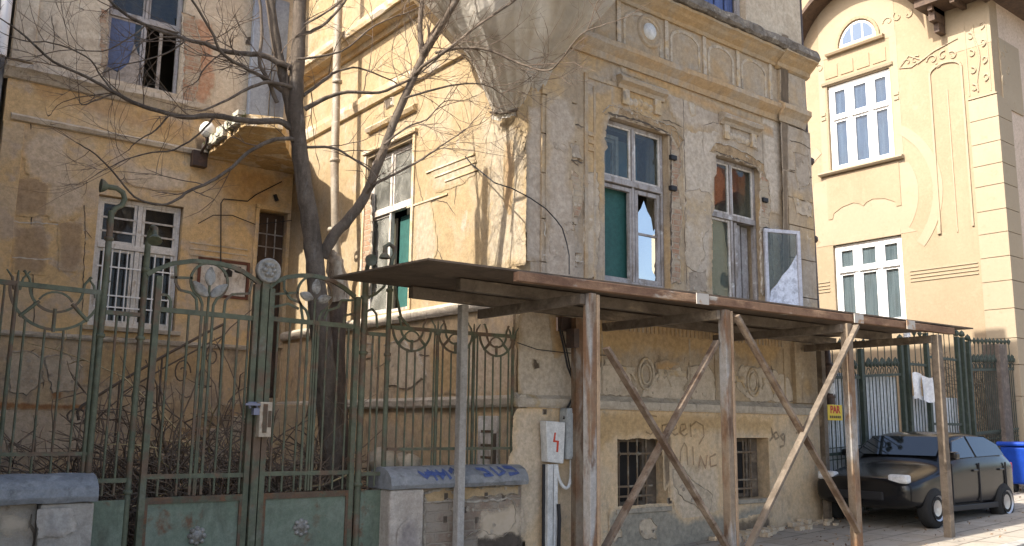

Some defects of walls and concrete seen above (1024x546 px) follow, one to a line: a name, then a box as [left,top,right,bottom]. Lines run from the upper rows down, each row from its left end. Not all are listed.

flaking render [181,11,203,101]
peeling [553,142,601,279]
peeling [602,105,713,293]